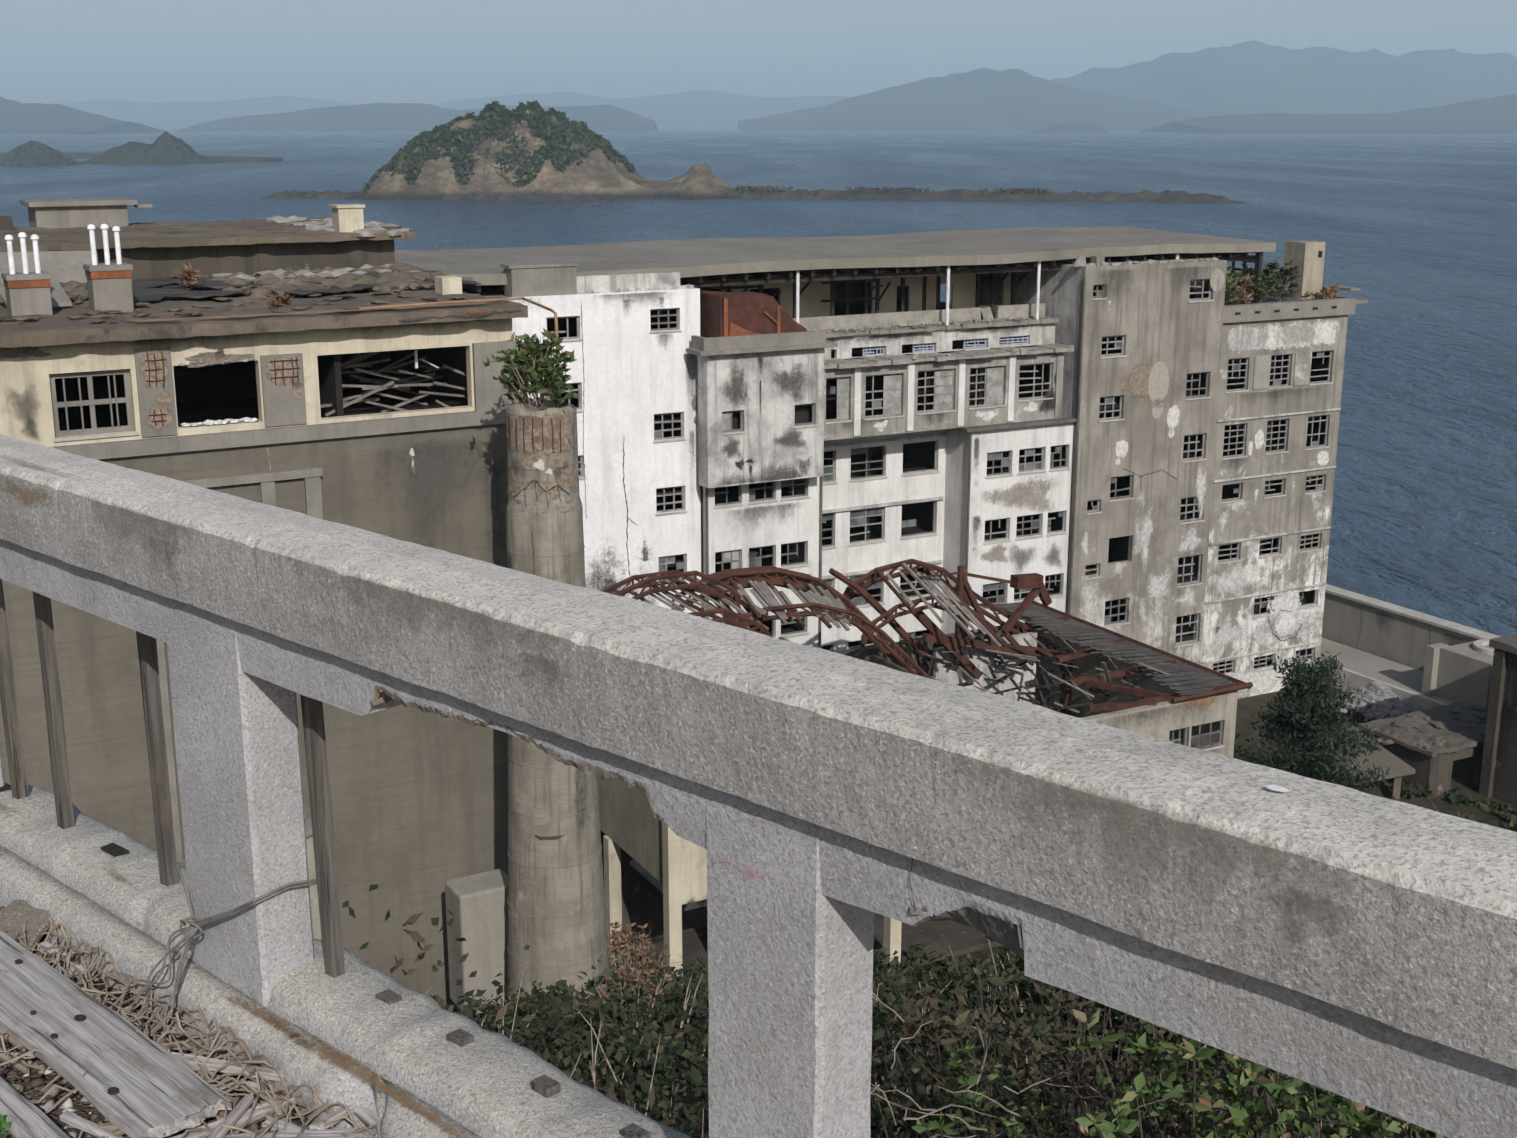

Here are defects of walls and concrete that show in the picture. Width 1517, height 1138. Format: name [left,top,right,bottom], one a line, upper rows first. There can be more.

water stain [725,358,805,411]
spalling [1120,361,1180,438]
water stain [721,431,809,485]
spalling [1115,440,1128,465]
water stain [989,481,1050,511]
peeling [1135,463,1319,657]
peeling [1225,658,1302,694]
spalling [370,685,664,821]